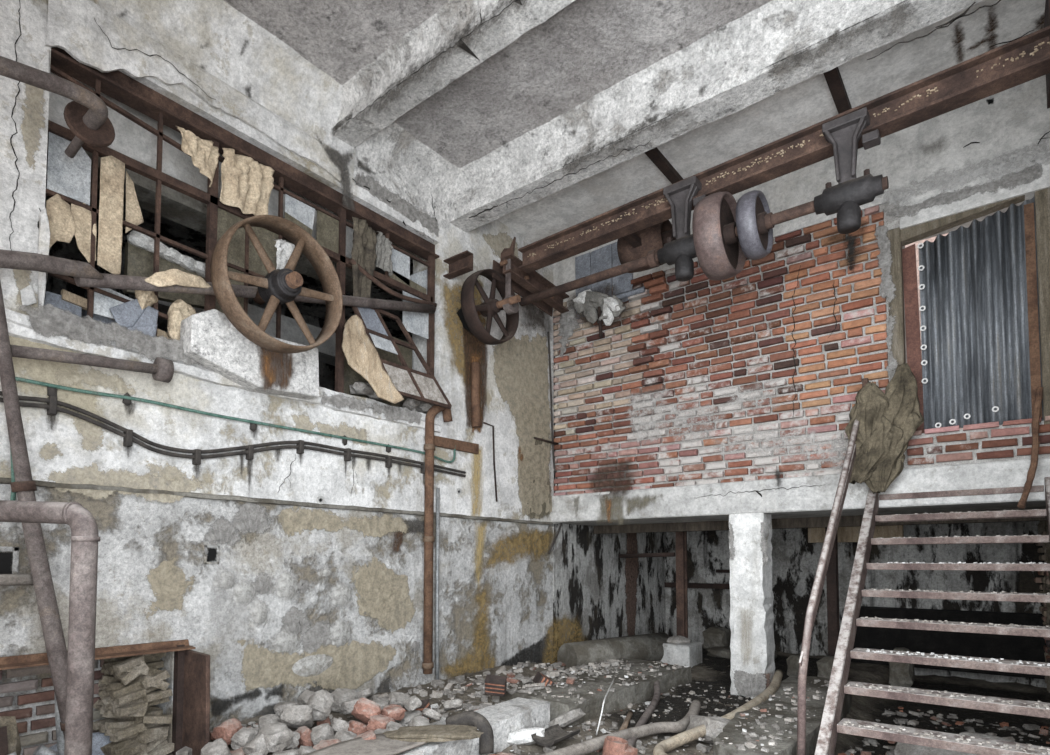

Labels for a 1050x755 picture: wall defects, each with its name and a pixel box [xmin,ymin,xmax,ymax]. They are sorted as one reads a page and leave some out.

crack [867,0,1001,60]
corrosion [953,8,998,62]
crack [469,140,651,218]
spalling [457,308,473,335]
corrosion [260,347,293,389]
flaking render [492,304,552,520]
flaking render [205,502,409,545]
damp [486,529,554,567]
flaking render [146,557,195,620]
flaking render [237,556,416,750]
damp [445,590,496,677]
damp [543,618,586,664]